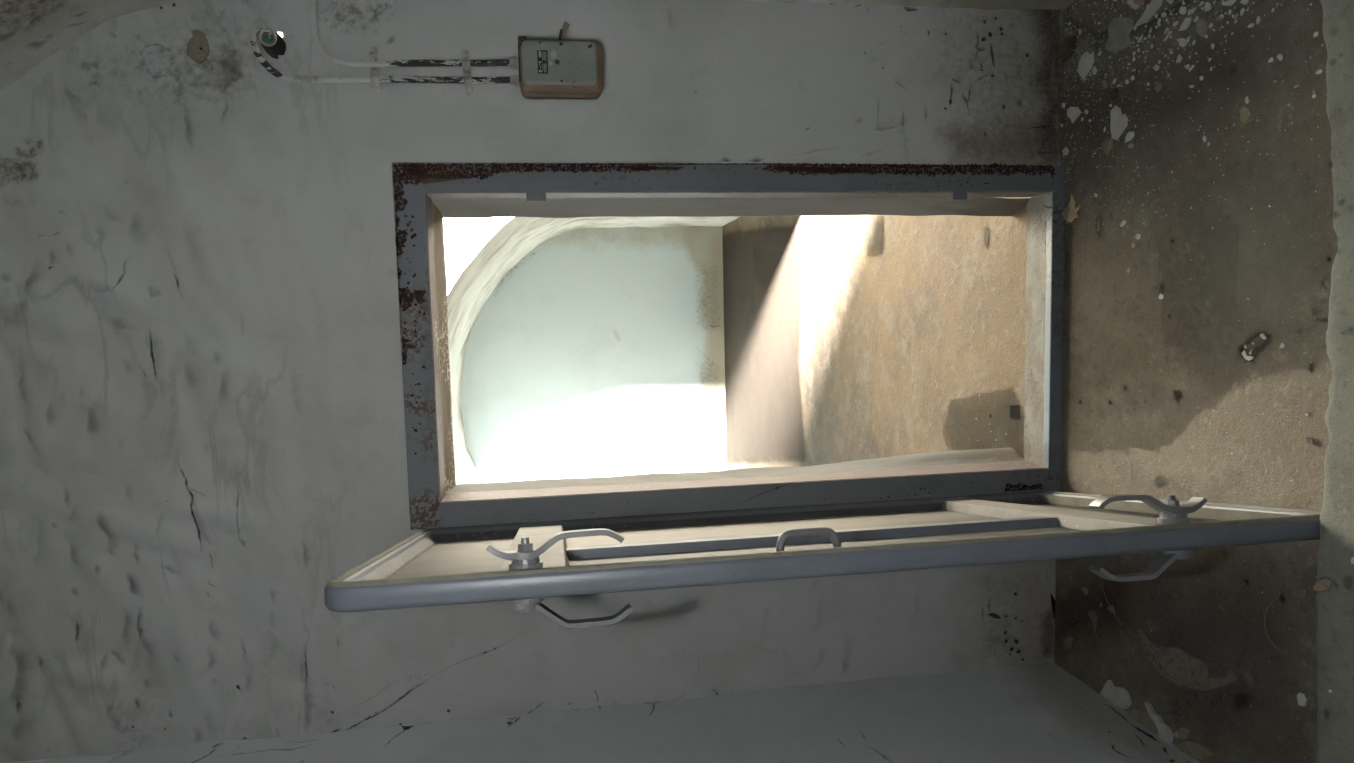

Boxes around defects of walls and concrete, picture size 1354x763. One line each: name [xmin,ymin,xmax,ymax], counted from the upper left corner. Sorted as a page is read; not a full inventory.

damp [187,30,209,64]
peeling [1077,17,1134,80]
peeling [1166,0,1208,63]
peeling [1067,107,1082,123]
peeling [1101,132,1134,156]
peeling [1061,193,1080,223]
rust [393,162,1055,432]
crack [181,471,212,558]